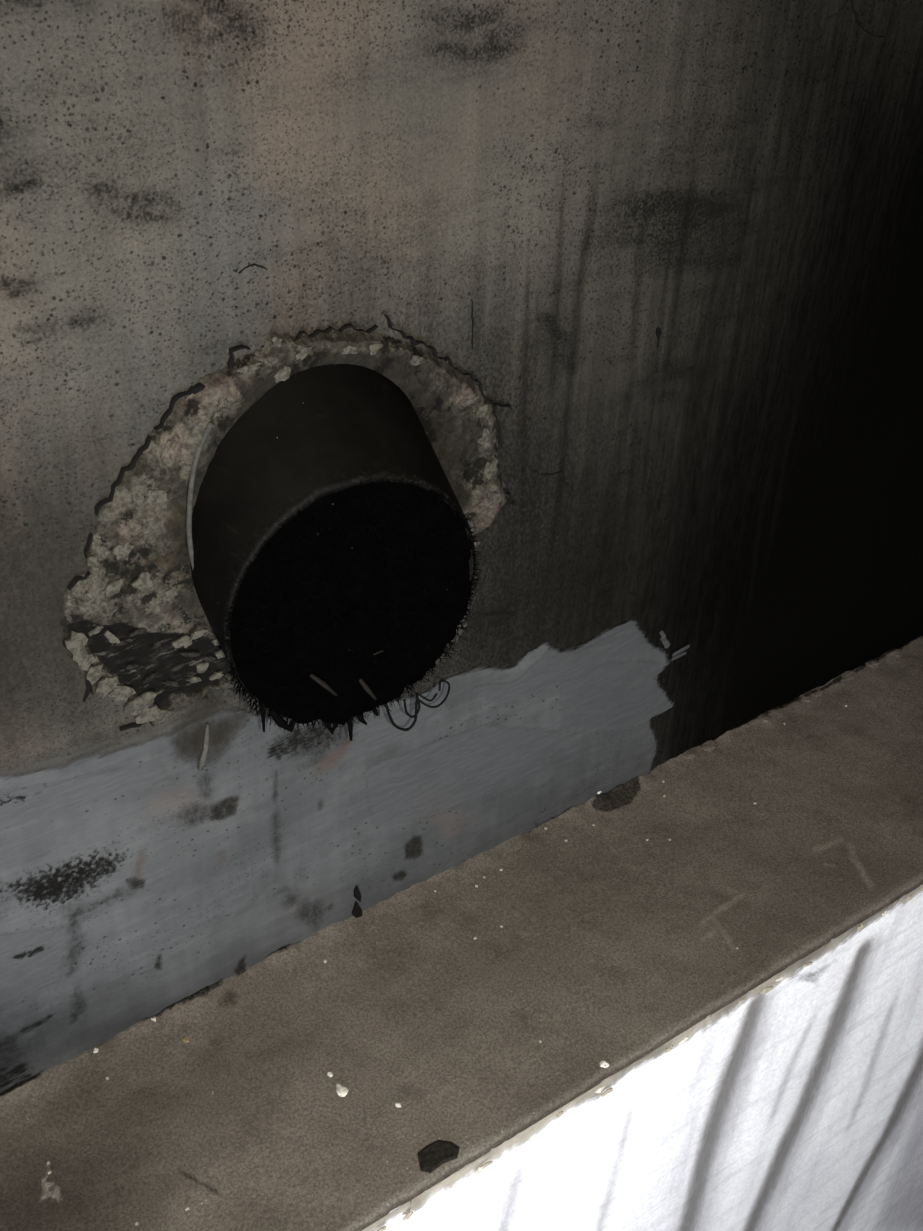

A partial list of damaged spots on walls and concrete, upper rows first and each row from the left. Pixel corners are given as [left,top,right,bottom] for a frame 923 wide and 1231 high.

peeling [235,362,261,374]
peeling [273,346,312,383]
peeling [340,343,383,355]
peeling [409,355,423,366]
peeling [462,395,491,444]
peeling [482,457,501,508]
peeling [111,541,134,561]
peeling [103,571,178,599]
spalling [62,620,230,731]